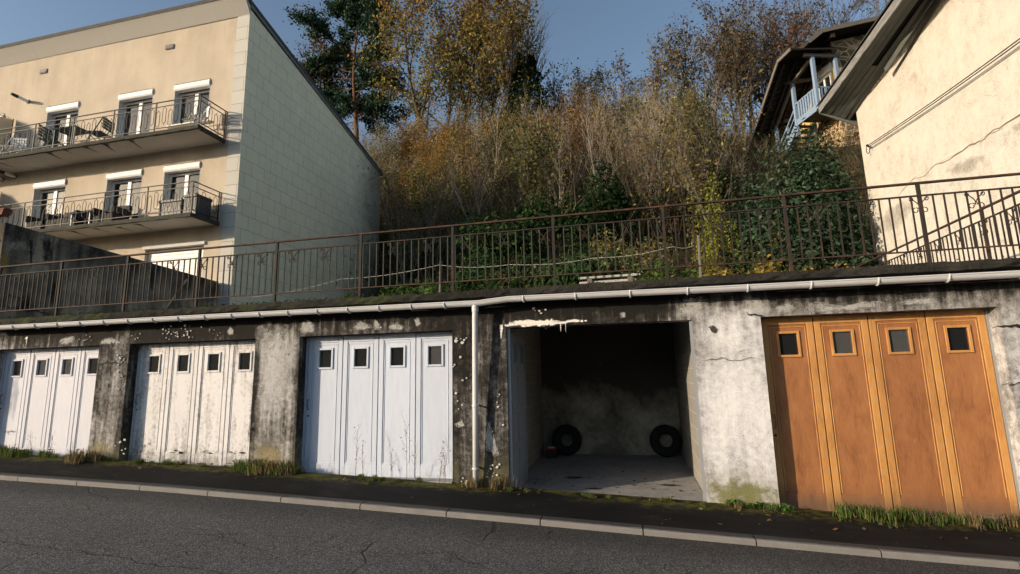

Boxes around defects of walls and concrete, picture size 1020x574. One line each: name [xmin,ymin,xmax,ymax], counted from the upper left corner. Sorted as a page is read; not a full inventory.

crack [898,114,1020,196]
peeling [499,319,587,338]
leakage [248,332,295,437]